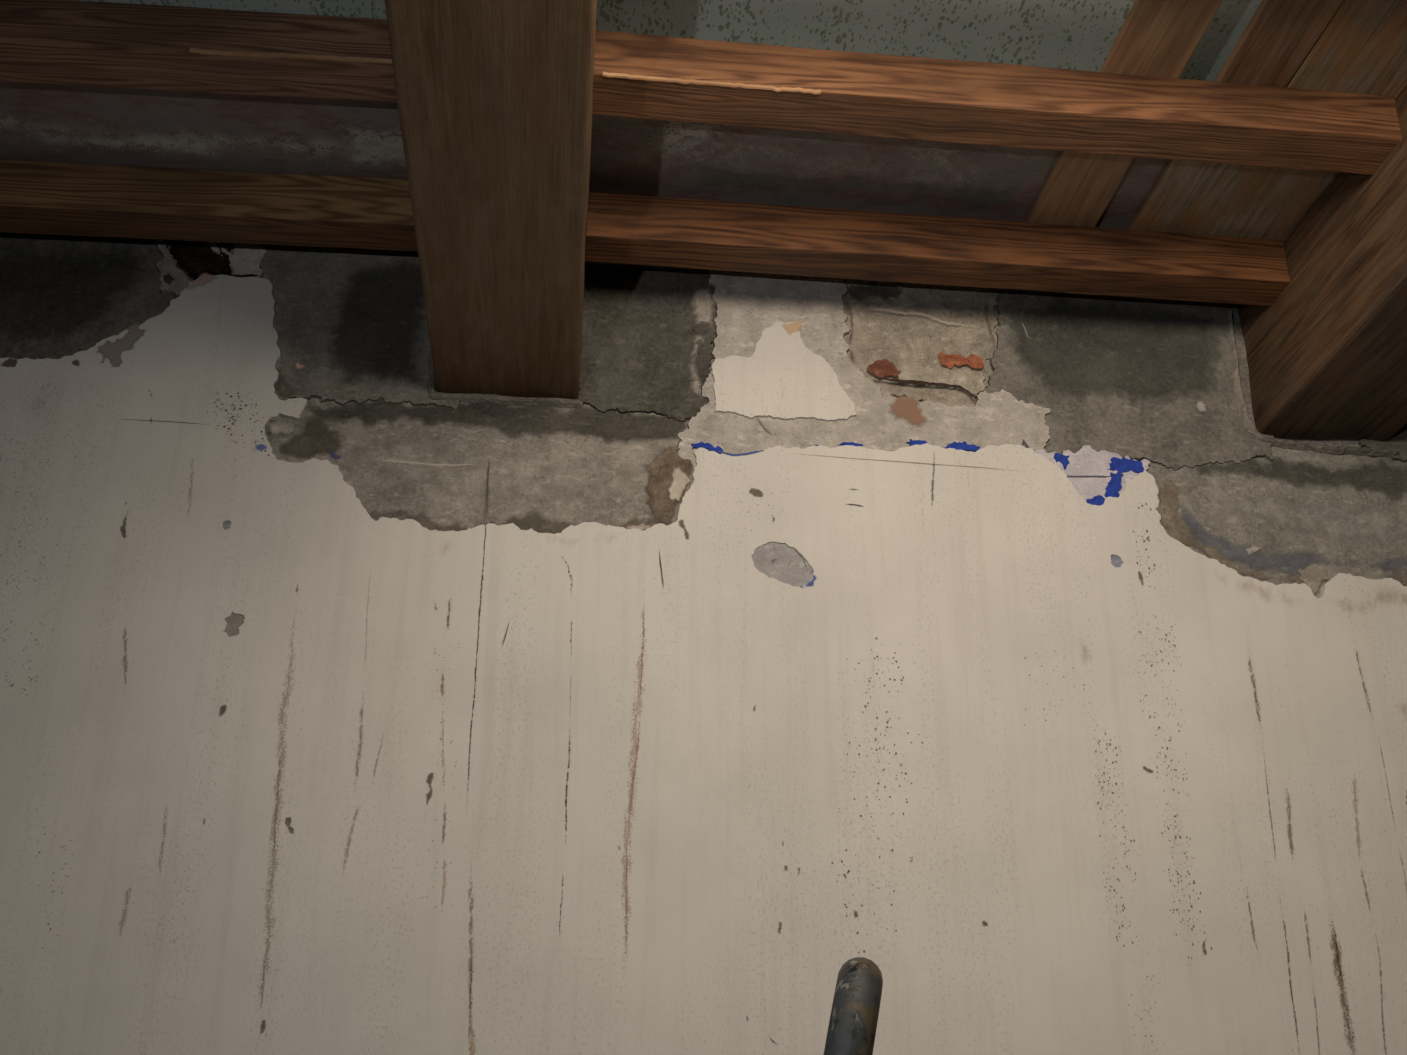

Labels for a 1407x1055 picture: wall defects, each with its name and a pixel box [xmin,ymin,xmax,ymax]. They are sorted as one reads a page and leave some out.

spalling [0,232,267,367]
spalling [265,269,1407,598]
corrosion [892,397,925,424]
corrosion [624,623,644,923]